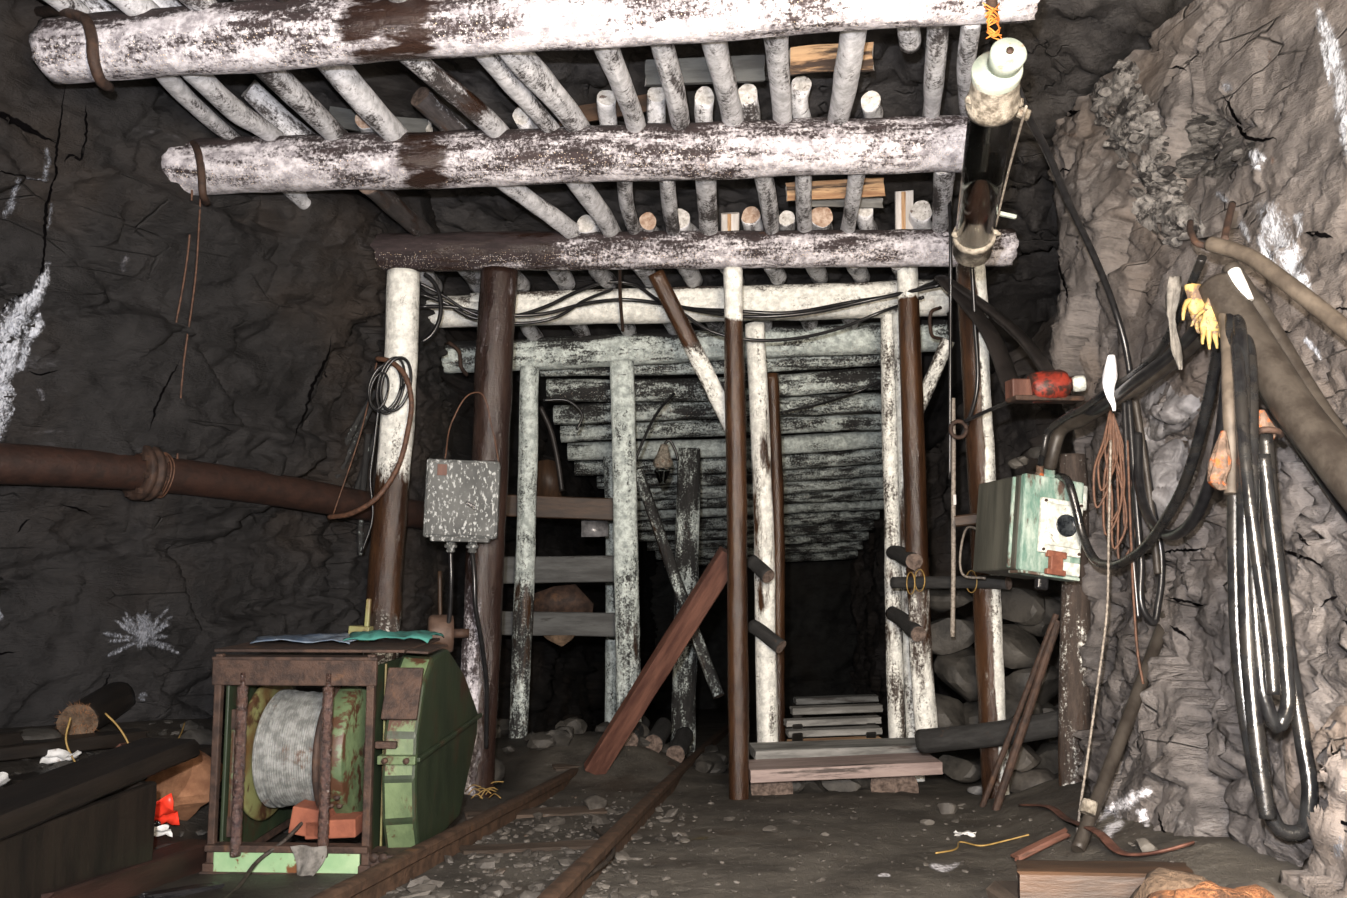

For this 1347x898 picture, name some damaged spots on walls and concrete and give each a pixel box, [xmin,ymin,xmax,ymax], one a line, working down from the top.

water stain [1316,9,1347,152]
water stain [0,271,49,438]